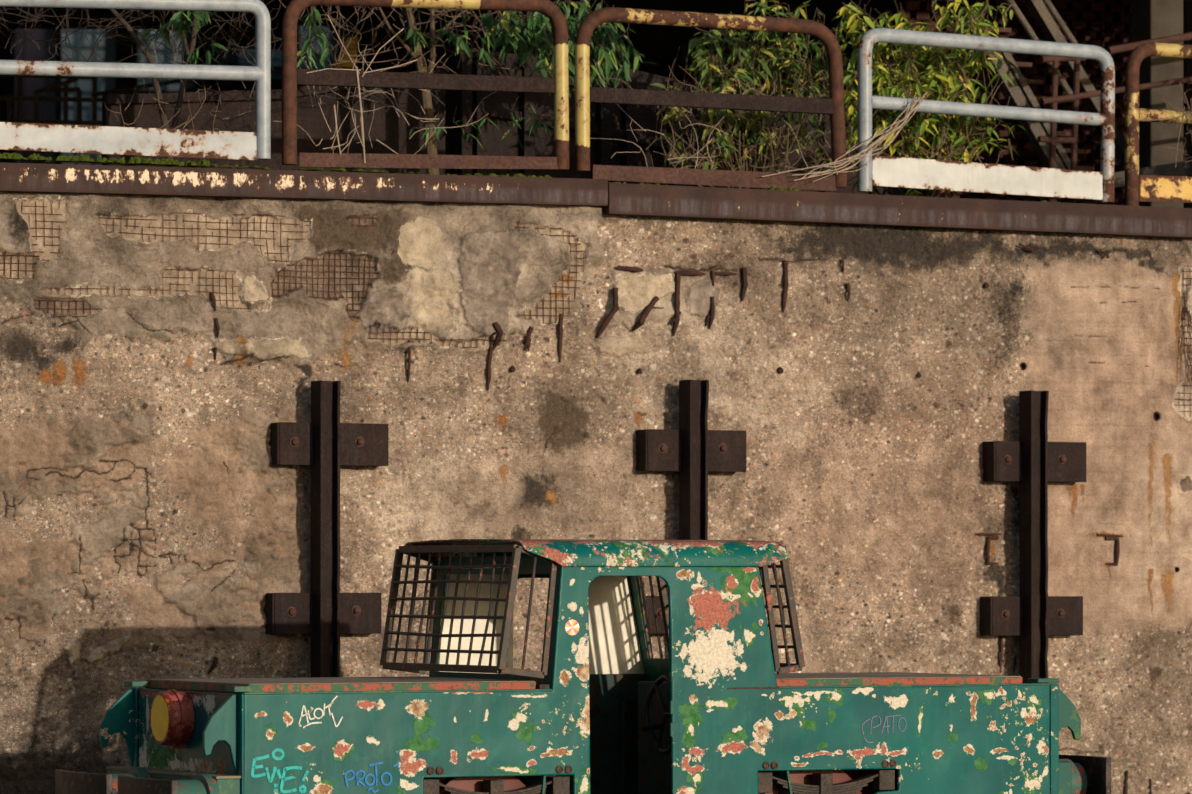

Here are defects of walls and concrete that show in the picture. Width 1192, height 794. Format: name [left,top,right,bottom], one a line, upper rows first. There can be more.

spalling [0,195,592,390]
rust [38,358,86,387]
spalling [1172,265,1192,420]
crack [3,459,235,610]
rust [1148,443,1172,539]
spalling [1181,476,1192,492]
rust [1148,569,1174,605]